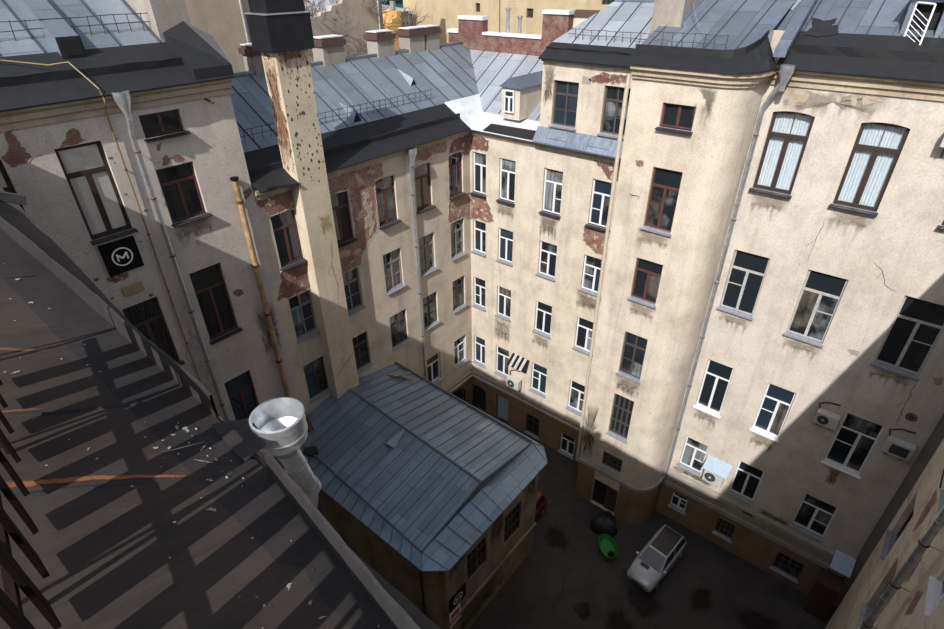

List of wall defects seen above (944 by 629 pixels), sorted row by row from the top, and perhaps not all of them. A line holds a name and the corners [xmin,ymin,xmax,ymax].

flaking render [0,131,32,168]
flaking render [59,128,86,148]
flaking render [243,52,383,274]
flaking render [415,134,489,161]
flaking render [448,192,494,223]
flaking render [582,225,610,256]